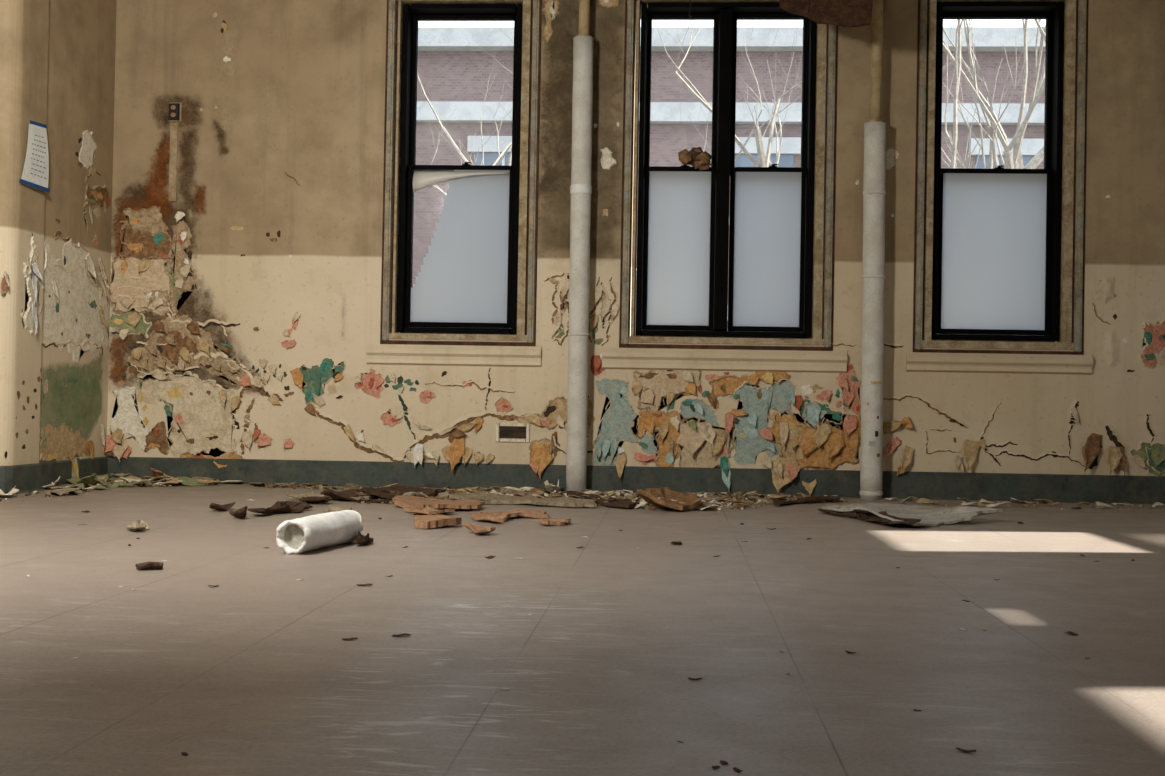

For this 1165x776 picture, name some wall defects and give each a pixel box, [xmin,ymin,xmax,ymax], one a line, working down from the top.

peeling [0,271,10,294]
peeling [16,130,436,485]
crack [98,263,594,462]
peeling [544,272,569,346]
peeling [587,276,861,495]
peeling [1127,317,1165,372]
peeling [494,396,567,480]
peeling [882,417,915,475]
crack [883,394,1085,467]
peeling [1081,414,1165,477]